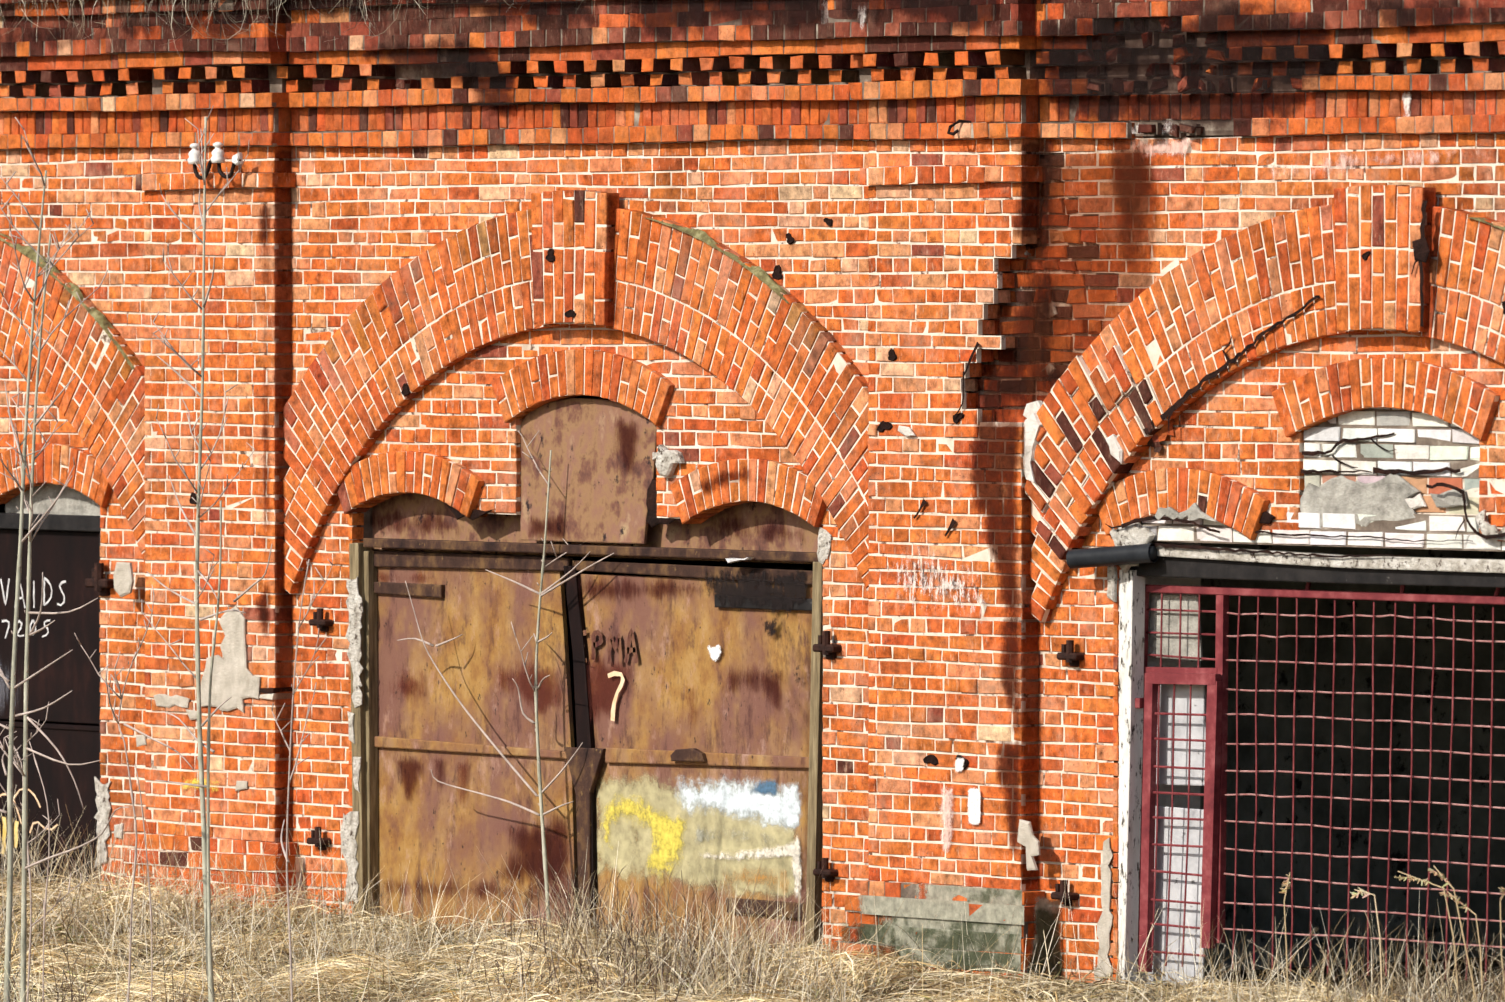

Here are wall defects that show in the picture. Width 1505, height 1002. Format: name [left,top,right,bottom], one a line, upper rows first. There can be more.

rust [619,421,634,469]
rust [529,514,561,535]
rust [586,579,671,596]
rust [728,673,778,704]
rust [400,760,442,796]
rust [507,822,565,898]